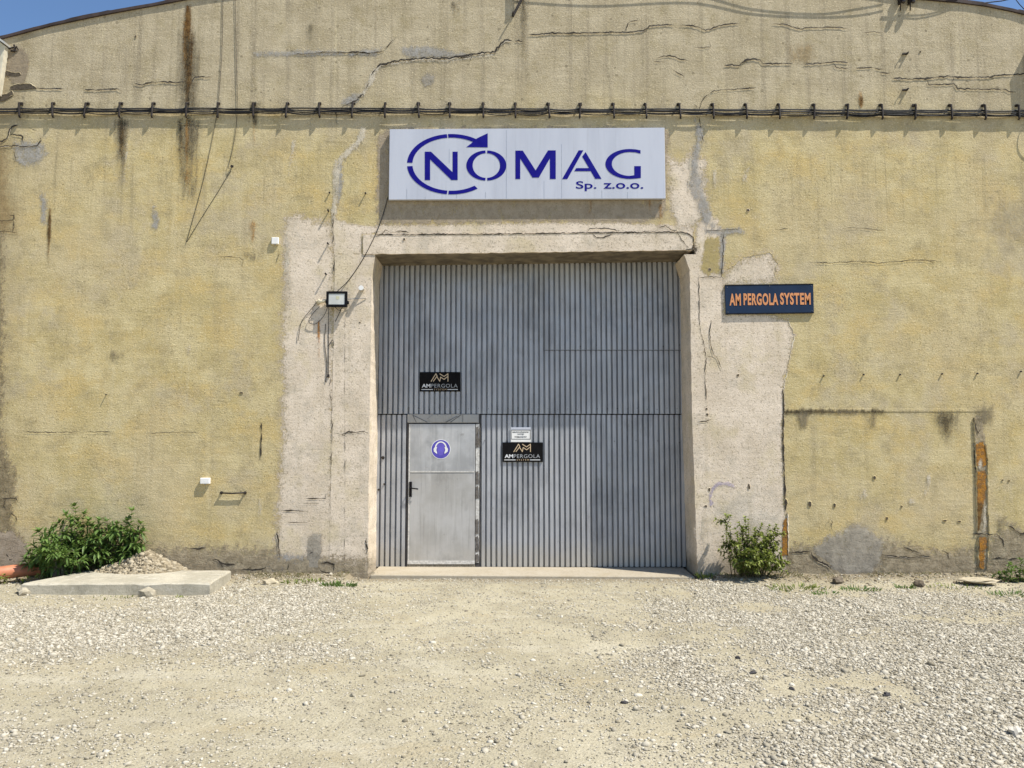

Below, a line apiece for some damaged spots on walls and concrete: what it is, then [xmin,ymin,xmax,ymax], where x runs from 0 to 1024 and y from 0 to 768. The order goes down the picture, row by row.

corrosion [183,5,193,102]
water stain [114,118,128,164]
crack [297,20,1024,422]
water stain [785,408,883,427]
water stain [935,413,958,435]